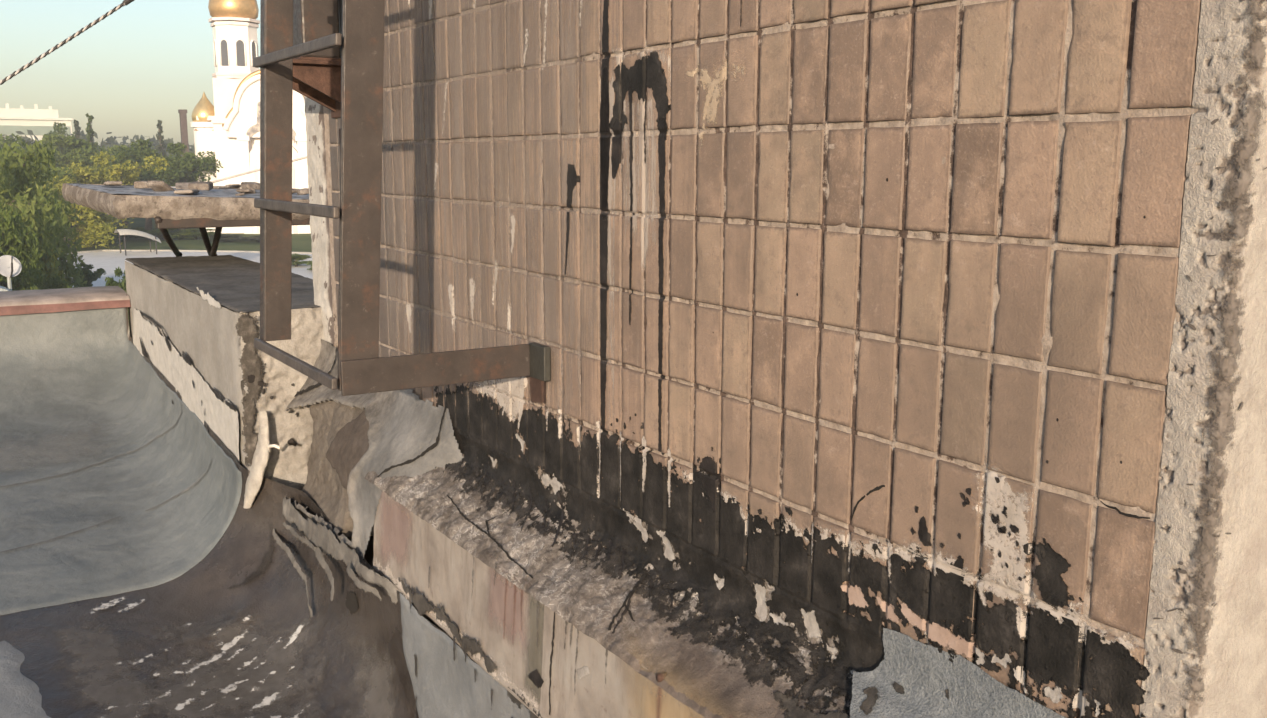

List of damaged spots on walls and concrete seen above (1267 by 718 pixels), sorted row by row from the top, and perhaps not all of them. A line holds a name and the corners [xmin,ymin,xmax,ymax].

spalling [235,314,273,476]
crack [377,388,448,477]
leakage [434,0,1150,718]
crack [447,495,533,578]
crack [852,485,885,518]
spalling [960,468,1034,597]
peeling [91,597,145,613]
peeling [153,617,303,718]
peeling [373,560,544,712]
crack [608,571,647,630]